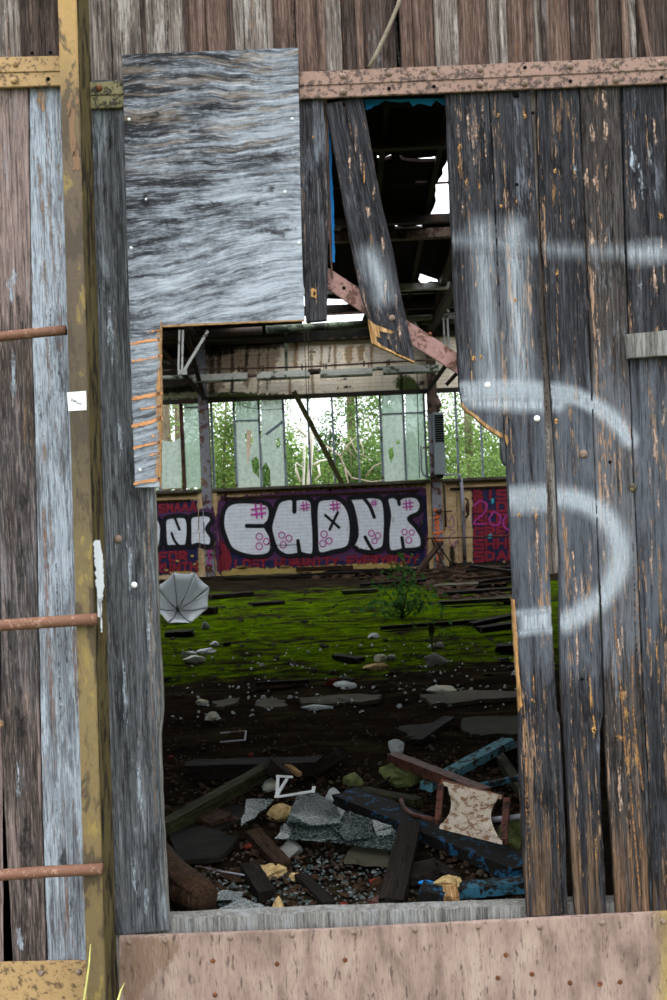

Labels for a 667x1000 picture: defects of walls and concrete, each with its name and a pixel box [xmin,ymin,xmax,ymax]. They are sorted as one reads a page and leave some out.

peeling [67,95,80,170]